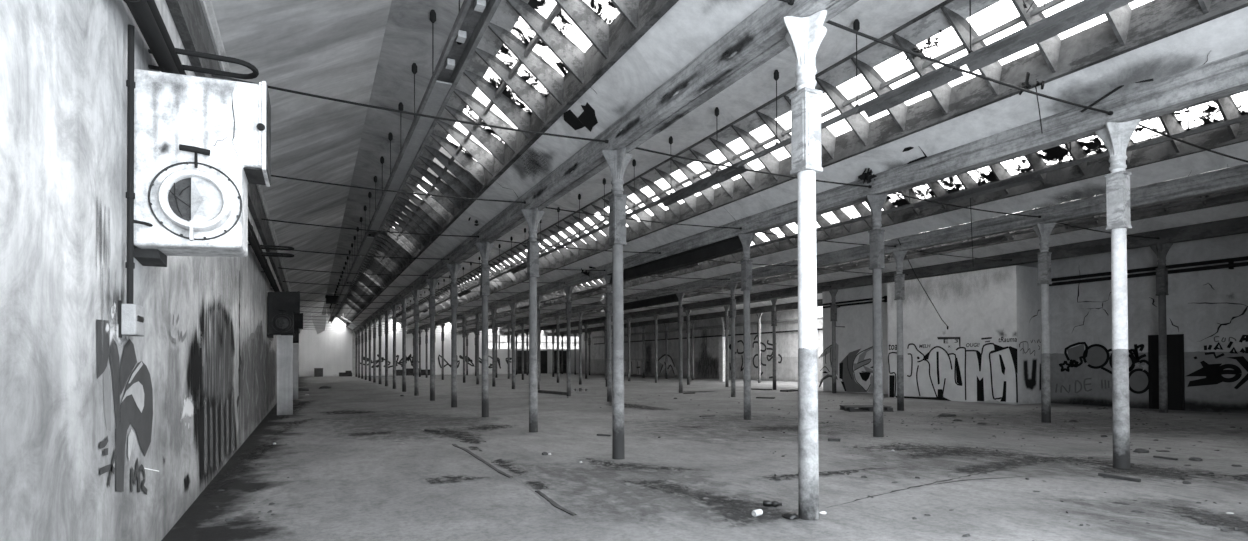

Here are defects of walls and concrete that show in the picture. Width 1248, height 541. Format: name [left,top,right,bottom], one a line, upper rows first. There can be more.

crack [206,81,238,156]
crack [1072,271,1111,332]
crack [1149,283,1248,341]